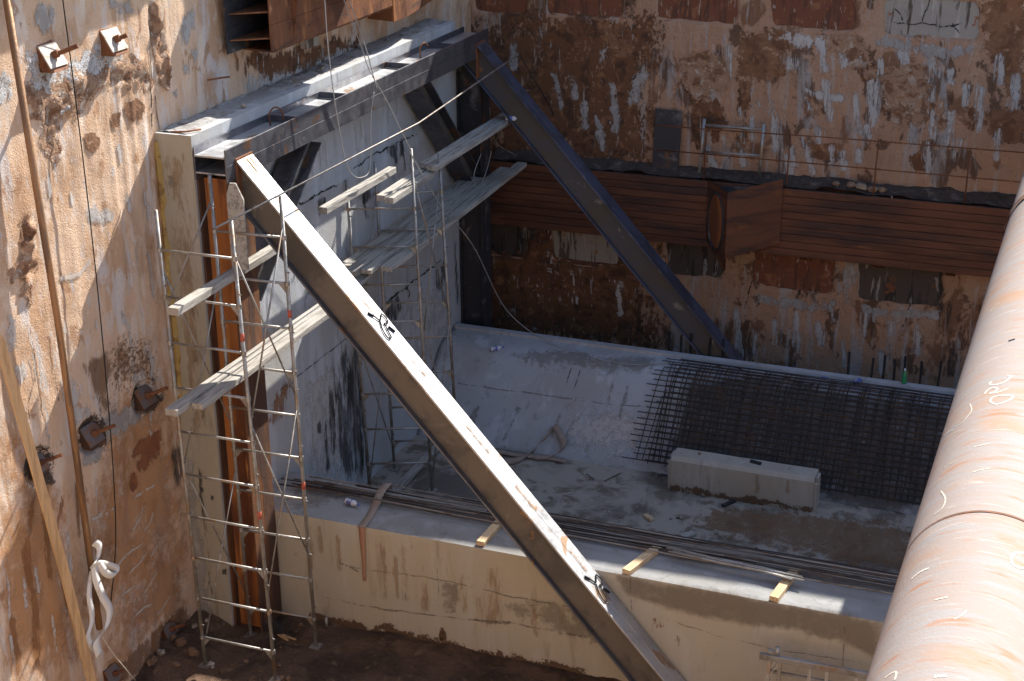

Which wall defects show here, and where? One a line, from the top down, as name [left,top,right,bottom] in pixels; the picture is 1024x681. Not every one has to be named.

crack [894,0,959,33]
spalling [25,0,178,165]
water stain [706,30,1021,177]
spalling [7,214,39,309]
spalling [129,428,162,492]
water stain [305,348,364,479]